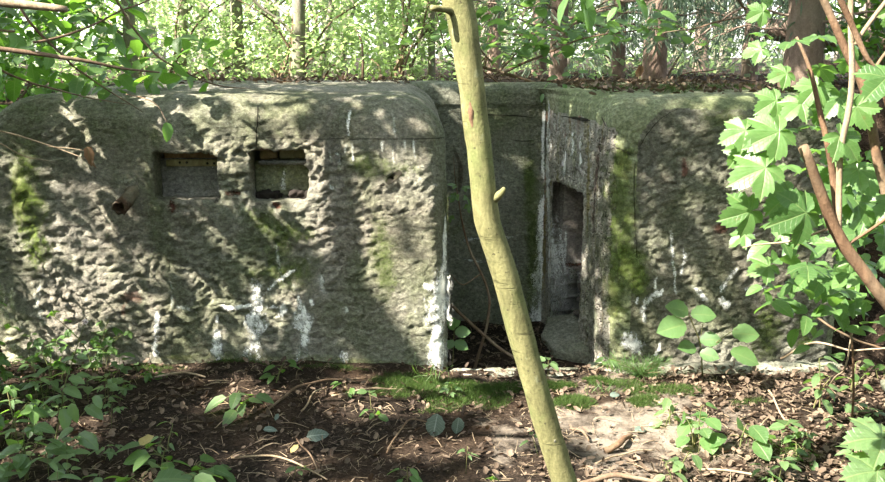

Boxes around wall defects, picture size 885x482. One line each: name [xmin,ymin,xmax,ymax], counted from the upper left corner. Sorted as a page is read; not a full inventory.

water stain [210,246,315,361]
water stain [423,217,453,369]
water stain [635,278,664,321]
water stain [152,313,160,357]
water stain [621,332,640,354]